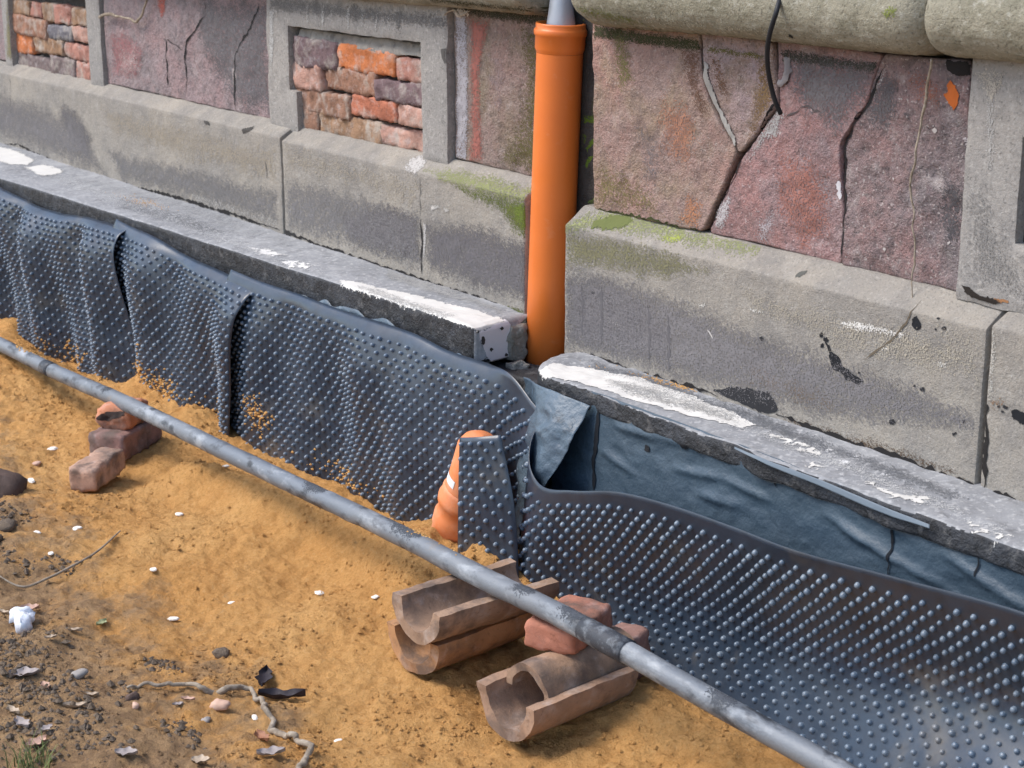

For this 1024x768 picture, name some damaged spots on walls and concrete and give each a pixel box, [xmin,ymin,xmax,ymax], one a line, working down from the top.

crack [165,2,206,90]
crack [233,6,259,105]
damp [0,92,526,318]
crack [711,100,820,227]
crack [841,65,886,259]
damp [565,229,1007,532]
crack [776,405,1016,500]